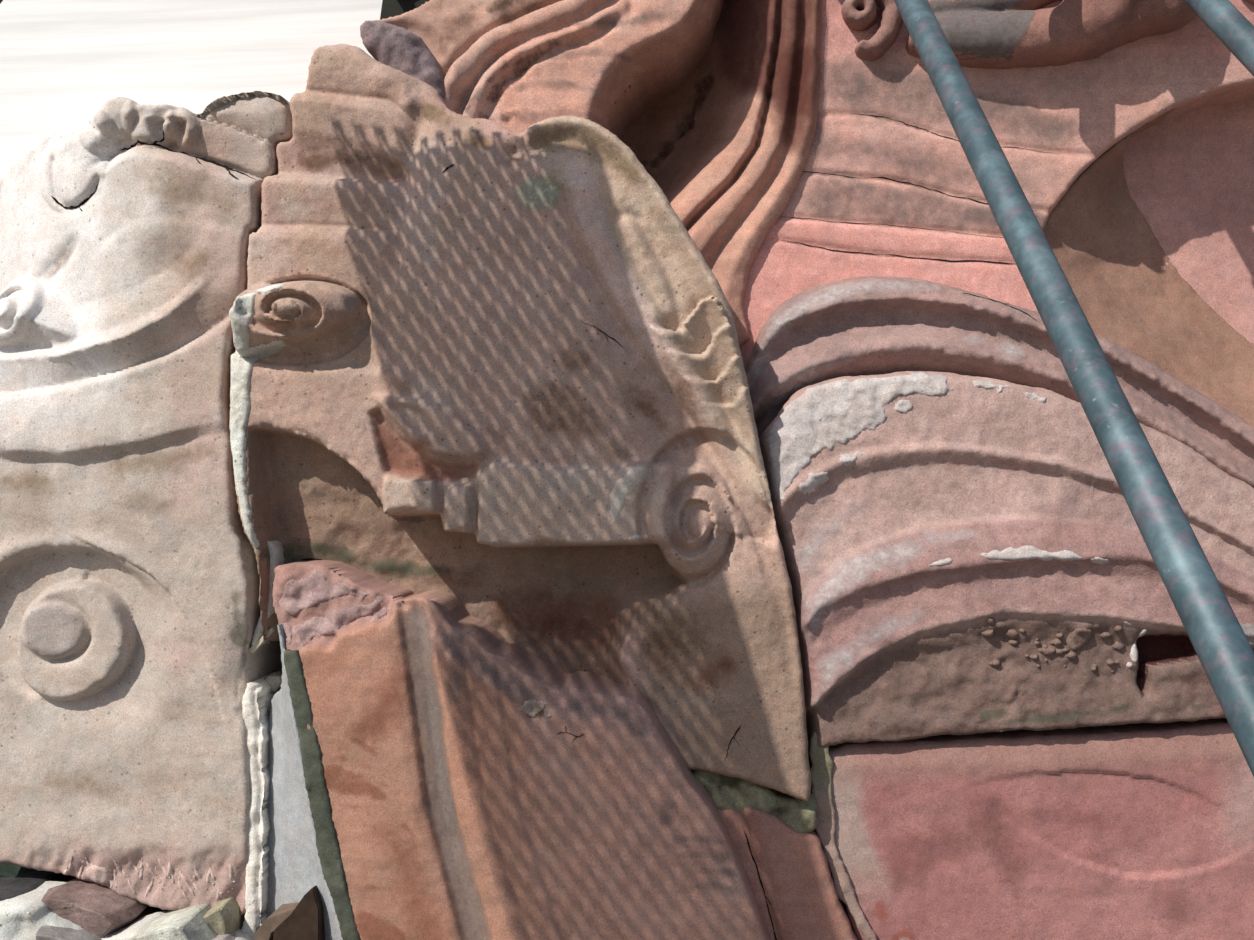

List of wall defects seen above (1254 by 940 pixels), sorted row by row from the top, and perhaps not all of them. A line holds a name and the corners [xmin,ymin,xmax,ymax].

crack [858,114,959,141]
crack [122,131,252,180]
crack [51,180,99,211]
crack [803,171,988,204]
crack [782,216,1014,264]
crack [966,293,1036,320]
peeling [972,379,1010,394]
peeling [766,372,953,503]
peeling [929,558,953,566]
peeling [980,545,1109,564]
spalling [981,618,1197,693]
spalling [264,560,771,940]